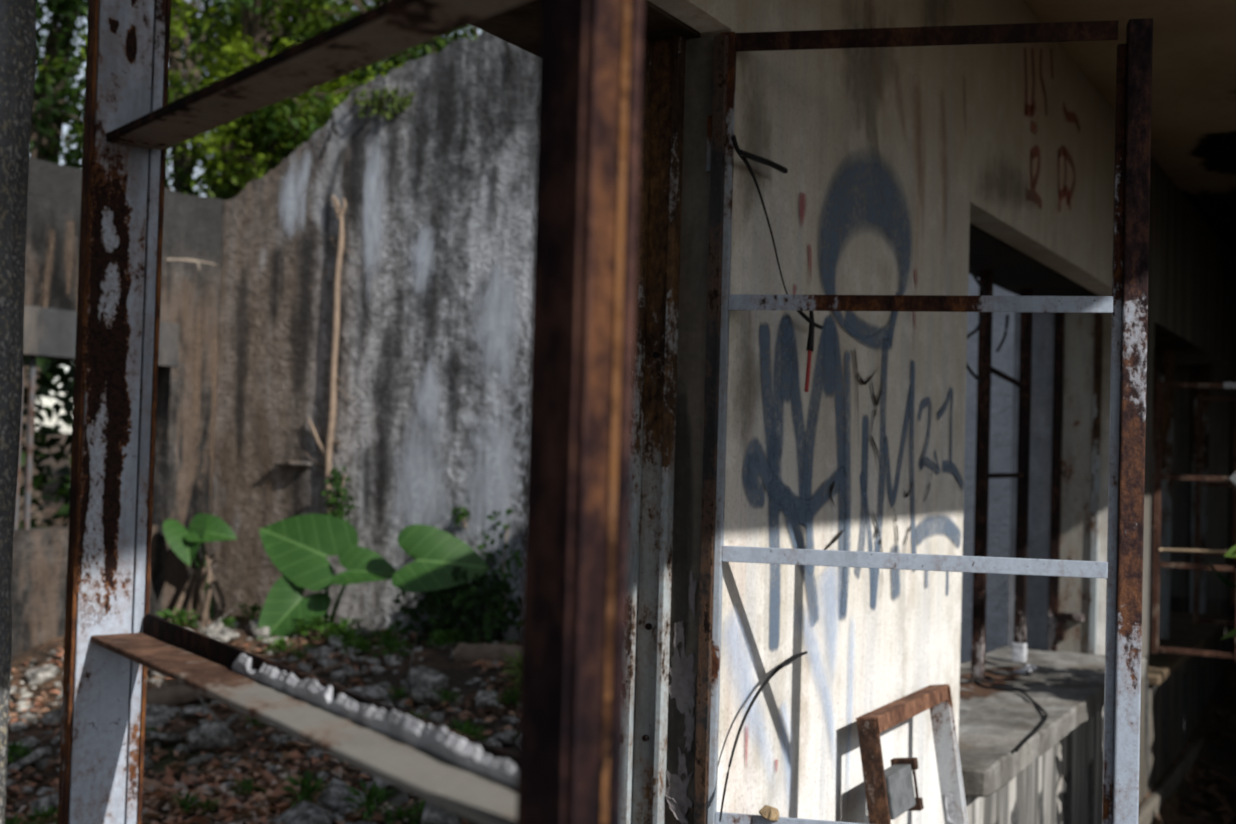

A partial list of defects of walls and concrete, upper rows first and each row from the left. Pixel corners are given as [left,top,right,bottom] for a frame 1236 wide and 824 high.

leakage [415,67,470,189]
rust [75,151,133,616]
leakage [236,280,248,447]
leakage [281,118,395,388]
leakage [365,336,460,525]
leakage [411,227,438,337]
leakage [470,414,516,551]
efflorescence [479,266,518,386]
peeling [665,571,697,824]